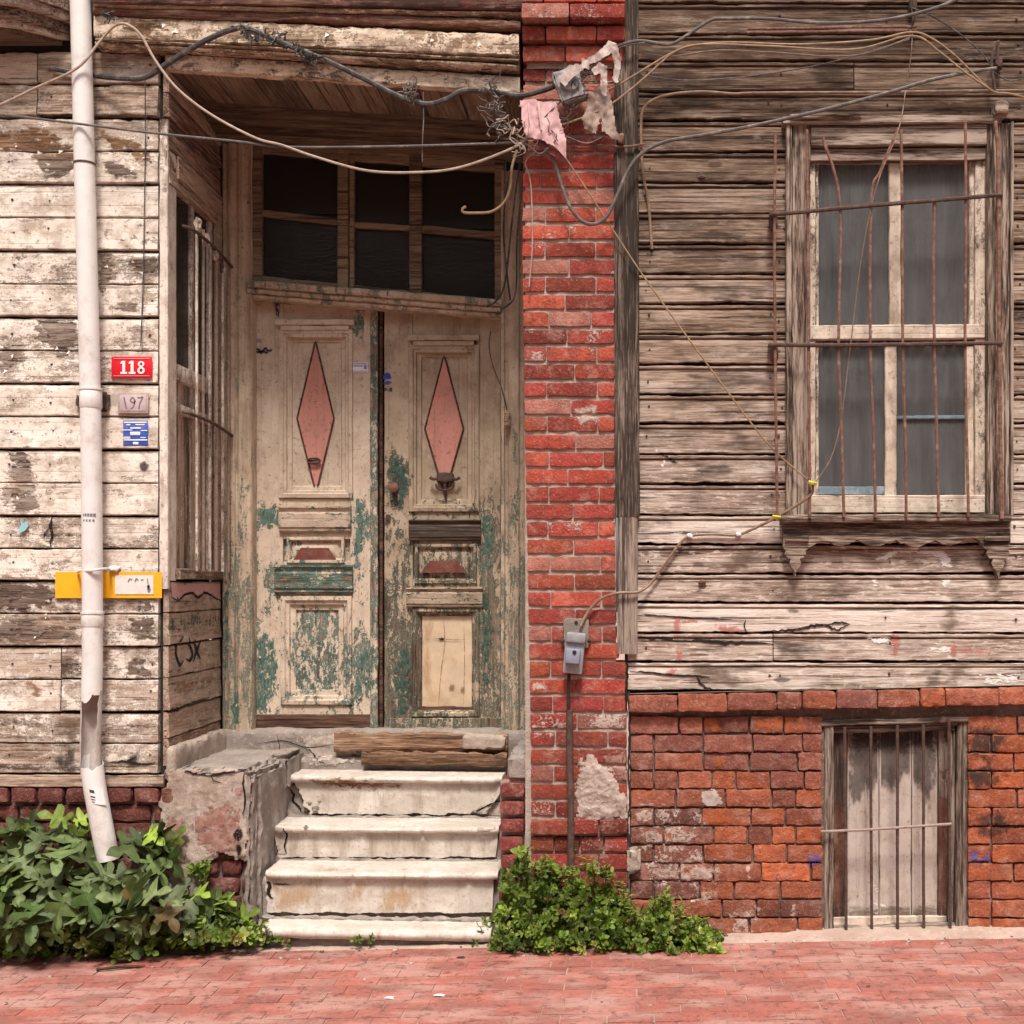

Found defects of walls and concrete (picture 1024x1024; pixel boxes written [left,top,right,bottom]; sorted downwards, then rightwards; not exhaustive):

peeling [98,247,157,311]
peeling [33,319,78,358]
peeling [8,452,40,512]
peeling [387,454,409,508]
peeling [351,498,368,585]
peeling [256,632,280,708]
crack [259,733,358,768]
crack [624,614,850,848]
spalling [166,788,248,866]
spalling [275,827,289,854]
crack [289,788,349,815]
crack [266,881,291,899]